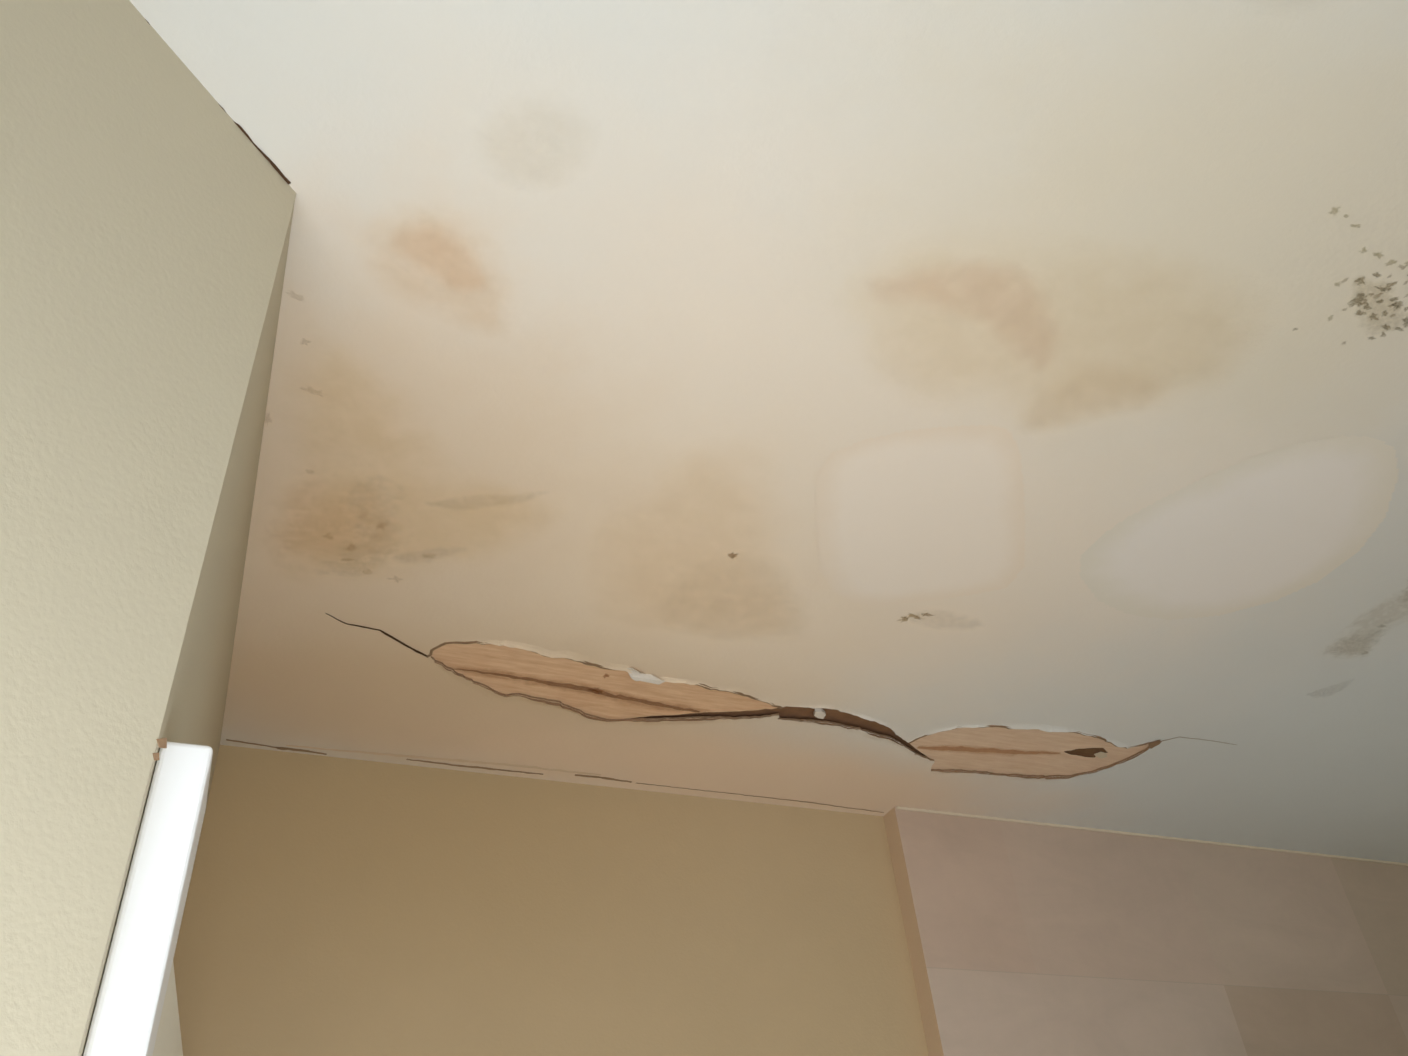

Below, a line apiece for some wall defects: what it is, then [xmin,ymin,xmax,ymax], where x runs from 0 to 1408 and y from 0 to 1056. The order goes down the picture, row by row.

crack [326,613,428,657]
peeling [422,639,786,725]
crack [630,704,933,764]
peeling [905,723,1165,781]